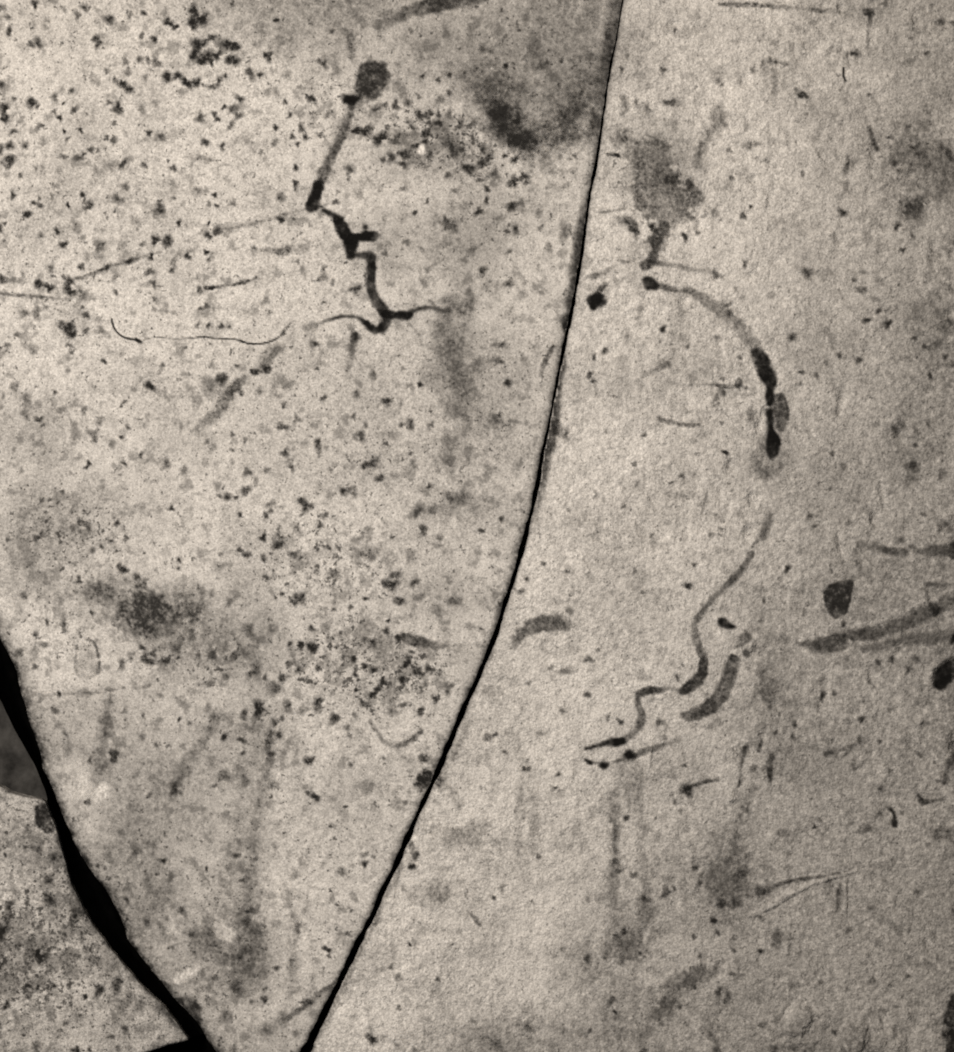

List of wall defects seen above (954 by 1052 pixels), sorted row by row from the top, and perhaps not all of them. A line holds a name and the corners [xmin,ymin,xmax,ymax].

crack [0,639,204,1037]
crack [283,0,623,1052]